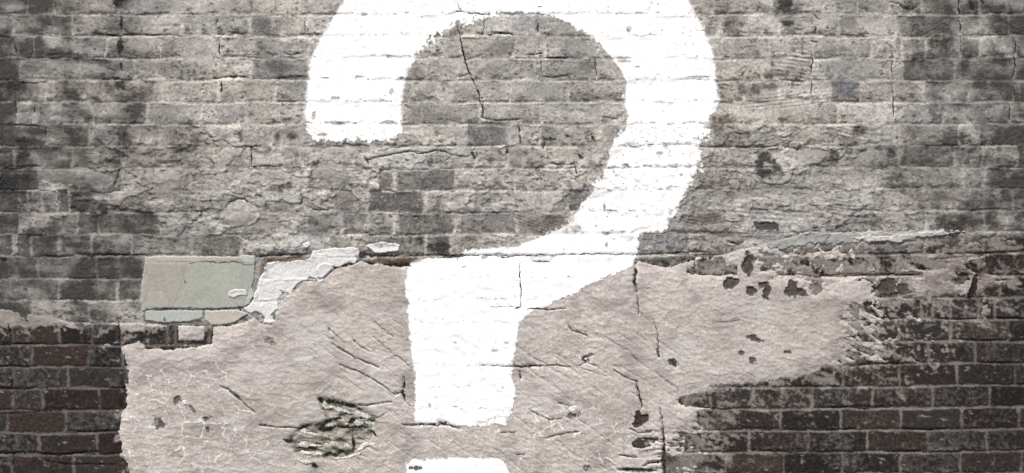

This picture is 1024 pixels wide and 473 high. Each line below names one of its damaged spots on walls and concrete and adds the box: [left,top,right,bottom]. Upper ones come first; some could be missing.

crack [451,5,615,174]
crack [365,146,476,164]
crack [192,254,306,265]
peeling [228,242,400,324]
spalling [723,251,809,300]
spalling [878,277,915,298]
spalling [957,269,985,300]
crack [328,228,760,473]
spalling [738,334,764,364]
spalling [283,397,377,468]